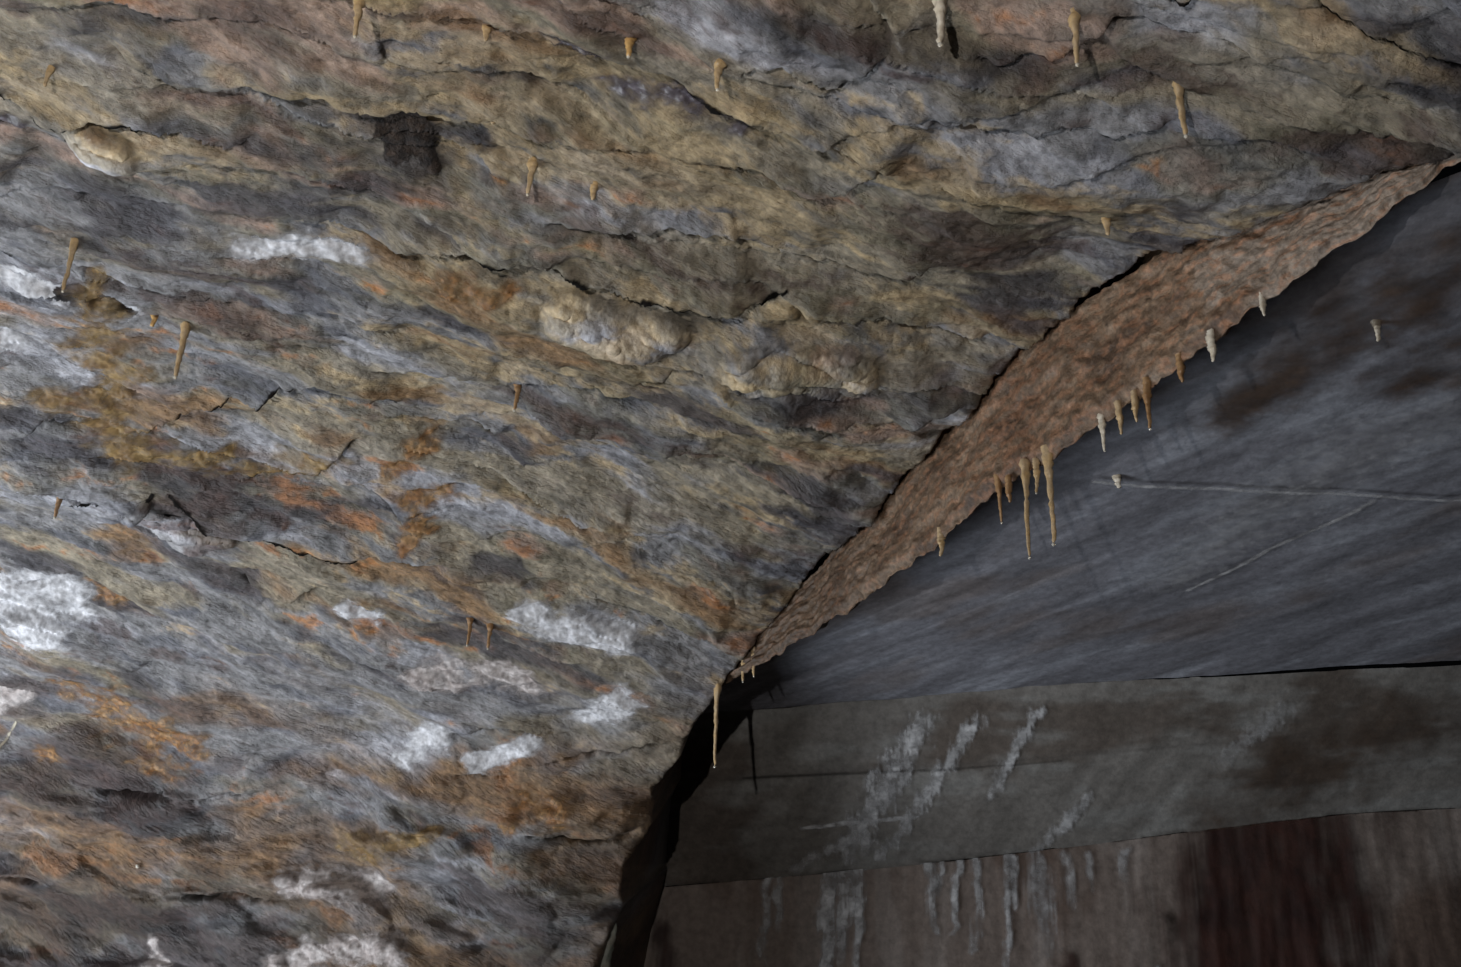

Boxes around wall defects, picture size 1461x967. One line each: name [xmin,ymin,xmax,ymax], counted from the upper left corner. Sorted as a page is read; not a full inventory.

water stain [988,708,1044,798]
water stain [795,715,983,967]
water stain [1003,795,1092,967]